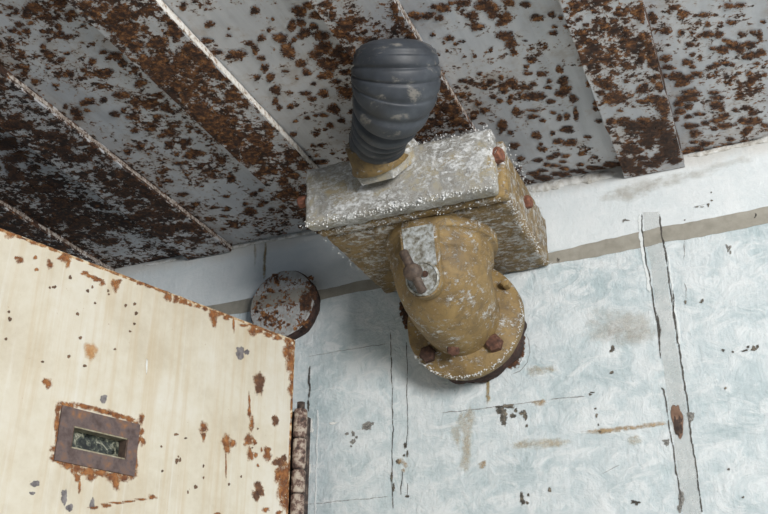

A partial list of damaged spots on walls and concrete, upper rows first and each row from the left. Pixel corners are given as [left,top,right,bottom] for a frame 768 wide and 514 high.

corrosion [0,228,71,271]
corrosion [0,118,122,247]
corrosion [92,169,205,244]
corrosion [5,0,368,216]
corrosion [301,0,768,268]
corrosion [50,401,146,493]
corrosion [91,495,156,509]
corrosion [81,247,317,409]
corrosion [222,373,290,514]
crack [307,333,408,514]
corrosion [650,405,684,439]
crack [638,215,703,512]